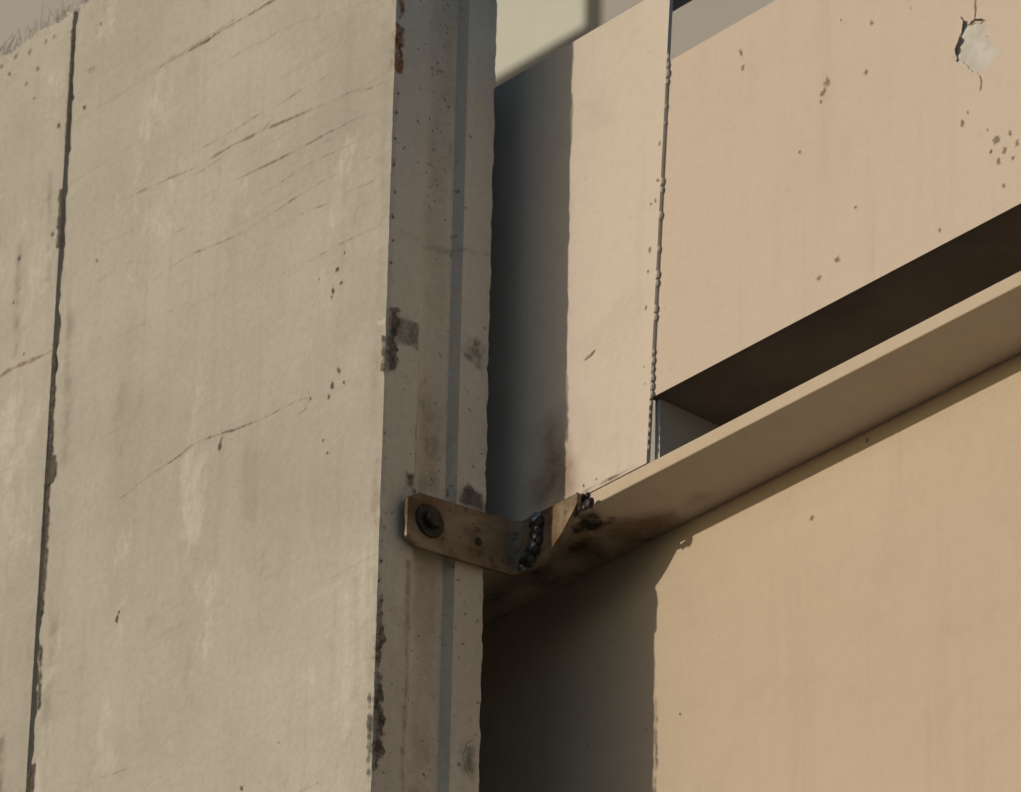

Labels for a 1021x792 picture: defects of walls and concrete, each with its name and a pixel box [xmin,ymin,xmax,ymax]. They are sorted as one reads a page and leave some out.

rust [395,23,404,73]
peeling [953,0,1000,89]